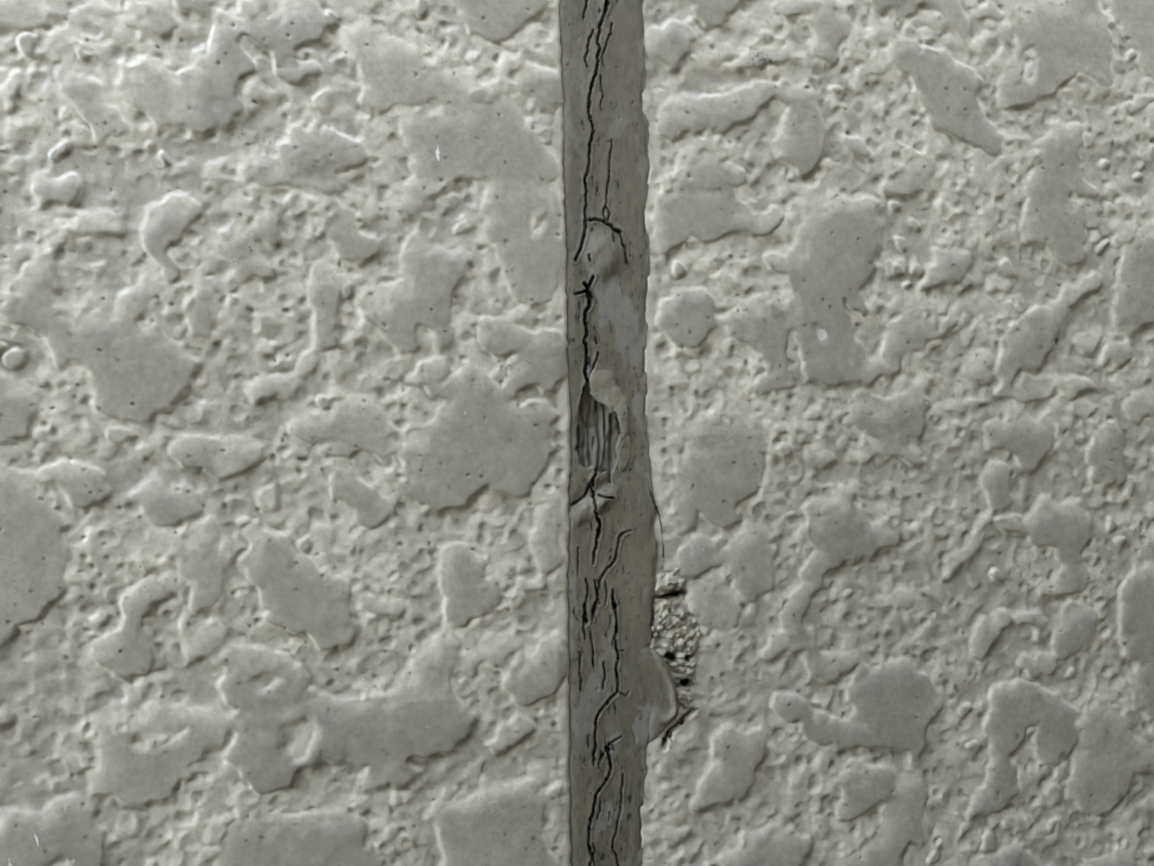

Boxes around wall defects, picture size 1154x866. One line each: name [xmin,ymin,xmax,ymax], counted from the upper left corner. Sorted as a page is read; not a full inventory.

crack [573,0,631,393]
peeling [575,368,630,481]
crack [572,469,632,866]
spalling [650,564,701,710]